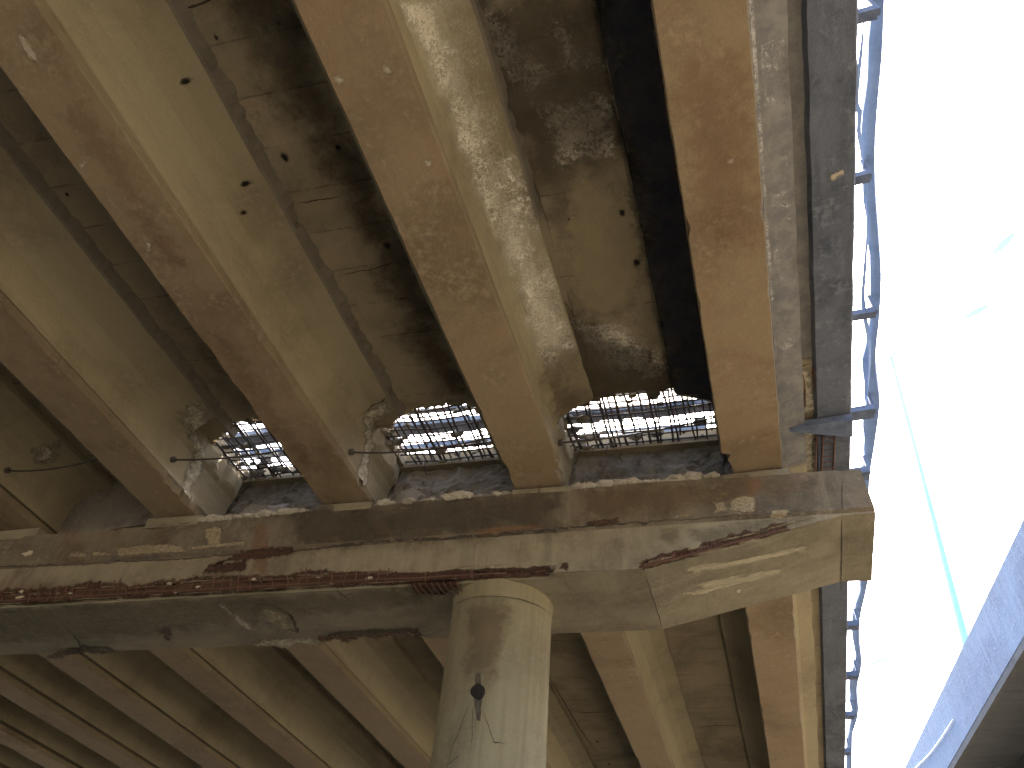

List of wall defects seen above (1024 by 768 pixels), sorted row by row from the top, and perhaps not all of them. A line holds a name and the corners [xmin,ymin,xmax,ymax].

water stain [232,0,462,392]
water stain [401,0,728,472]
spalling [179,403,302,502]
spalling [357,401,497,486]
spalling [563,399,717,464]
rust [202,547,294,574]
spalling [0,566,555,630]